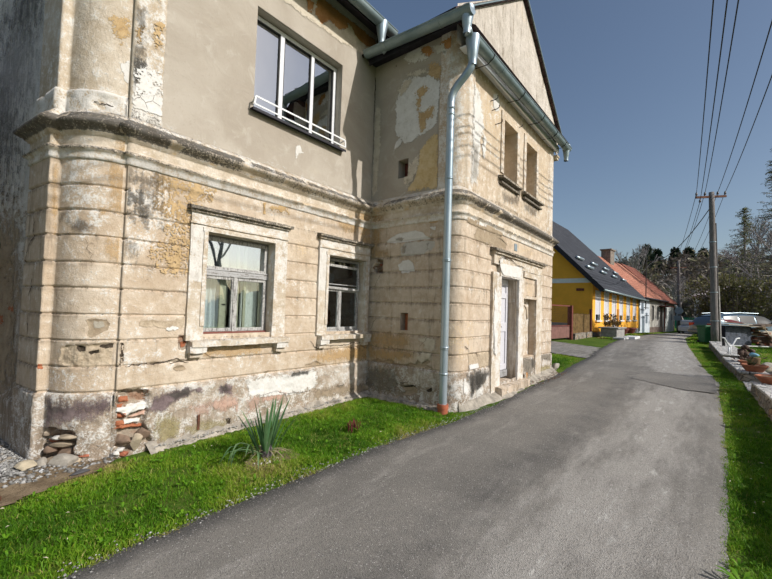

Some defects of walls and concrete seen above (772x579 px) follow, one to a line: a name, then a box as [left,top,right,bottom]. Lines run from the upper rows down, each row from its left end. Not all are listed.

peeling [108,15,167,48]
peeling [284,0,377,54]
peeling [121,60,165,116]
peeling [394,36,451,192]
peeling [148,172,217,278]
peeling [387,226,436,274]
spalling [58,318,124,367]
damp [467,369,489,397]
flaking render [42,434,89,462]
flaking render [112,389,151,457]